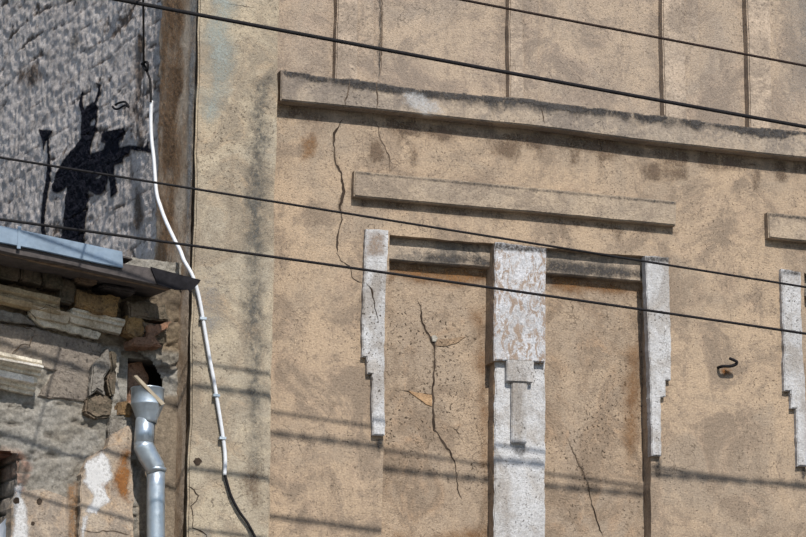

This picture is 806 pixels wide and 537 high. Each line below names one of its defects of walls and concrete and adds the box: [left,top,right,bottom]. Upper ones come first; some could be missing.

crack [375,0,390,168]
crack [333,83,378,317]
leakage [386,118,456,140]
leakage [496,134,639,163]
leakage [698,151,758,188]
crack [399,302,461,497]
peeling [13,486,28,537]
peeling [82,453,112,536]
crack [567,438,603,536]